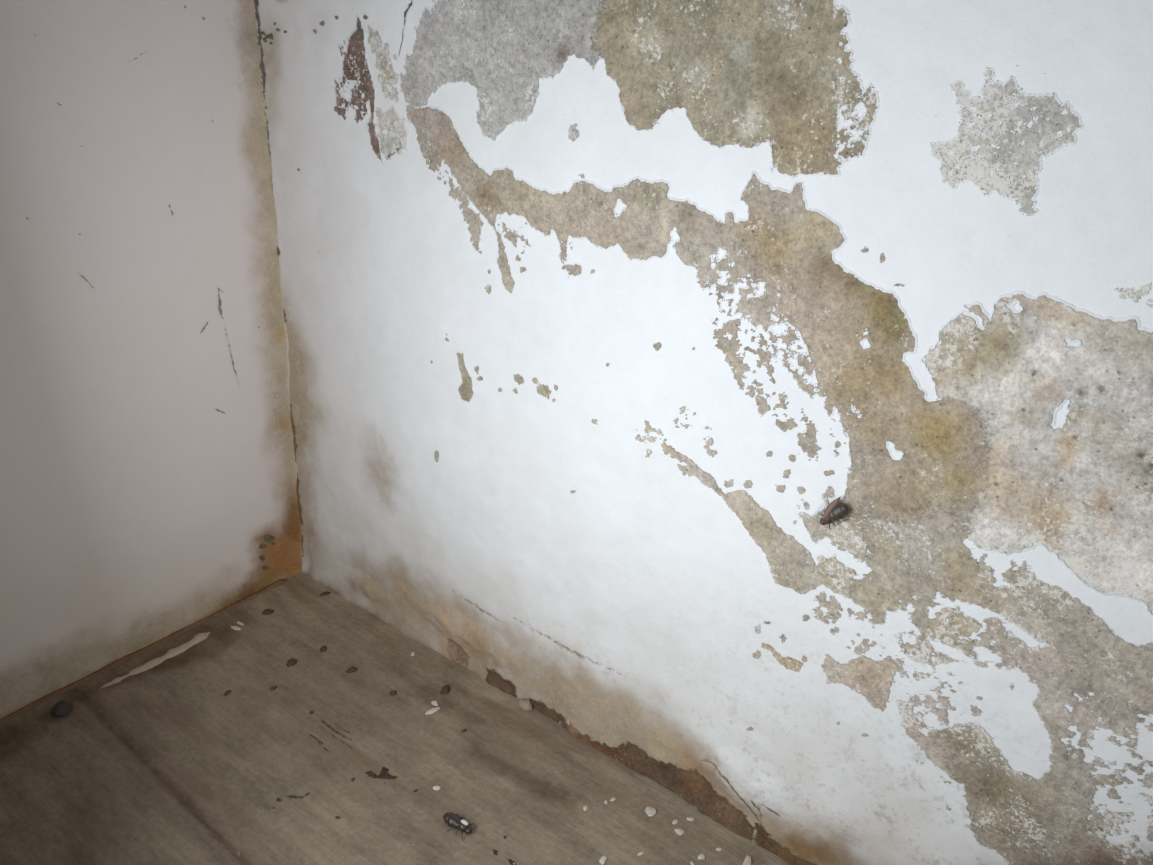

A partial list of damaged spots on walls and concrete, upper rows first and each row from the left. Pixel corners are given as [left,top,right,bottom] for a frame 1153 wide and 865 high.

leakage [248,66,276,230]
leakage [253,22,287,50]
leakage [265,251,311,503]
peeling [332,0,1153,865]
leakage [357,568,789,841]
leakage [810,843,853,865]